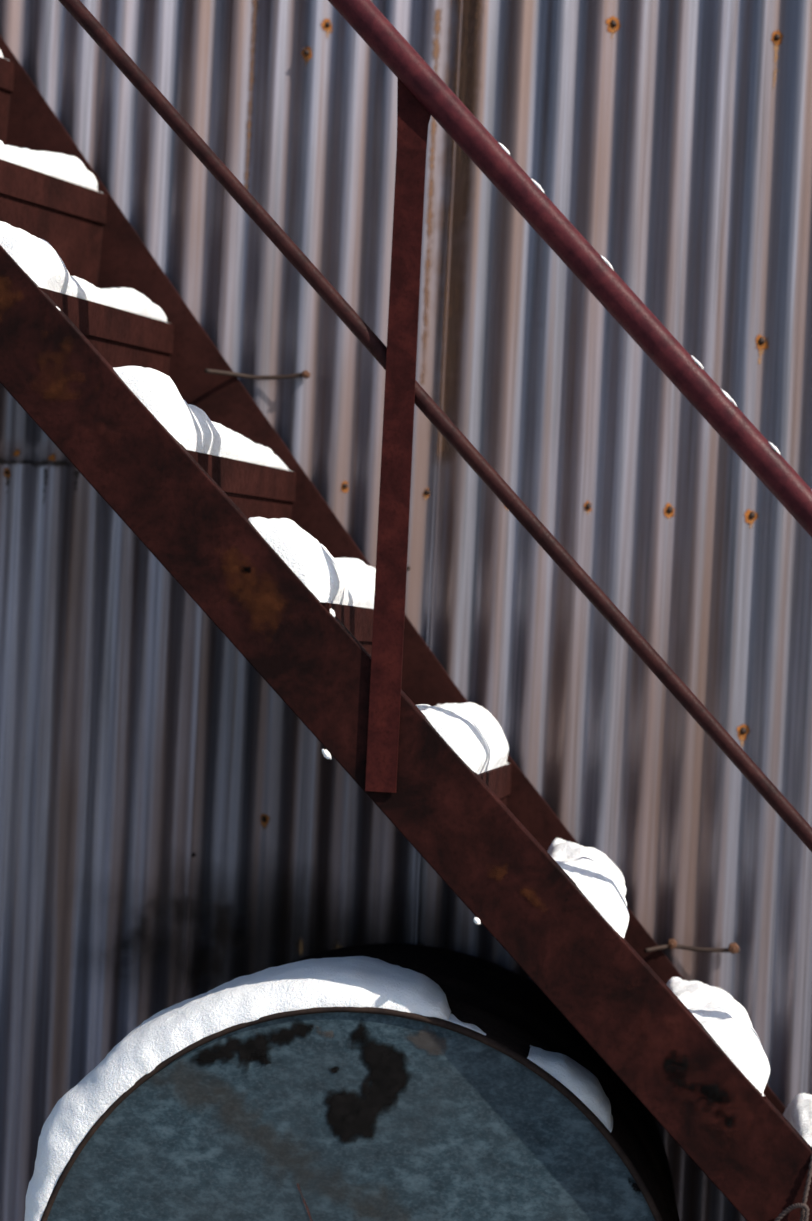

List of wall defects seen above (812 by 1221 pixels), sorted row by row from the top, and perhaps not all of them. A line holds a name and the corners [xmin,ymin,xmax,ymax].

rust [433,0,479,114]
rust [606,16,620,37]
rust [423,117,470,414]
rust [737,724,750,745]